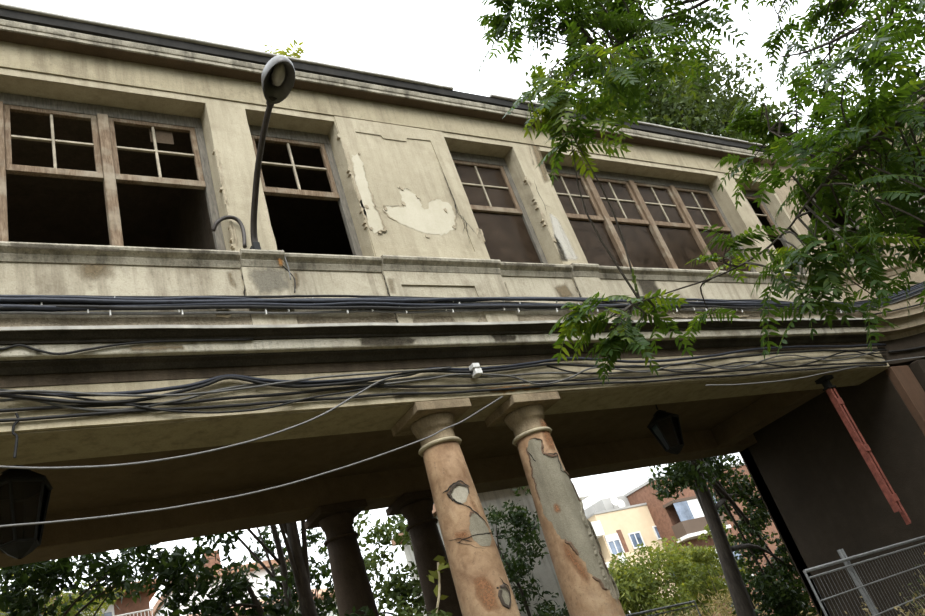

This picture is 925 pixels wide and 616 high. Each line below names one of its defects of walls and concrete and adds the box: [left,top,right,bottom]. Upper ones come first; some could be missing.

peeling [336,133,457,238]
peeling [442,480,492,546]
peeling [526,438,620,603]
peeling [496,577,511,609]